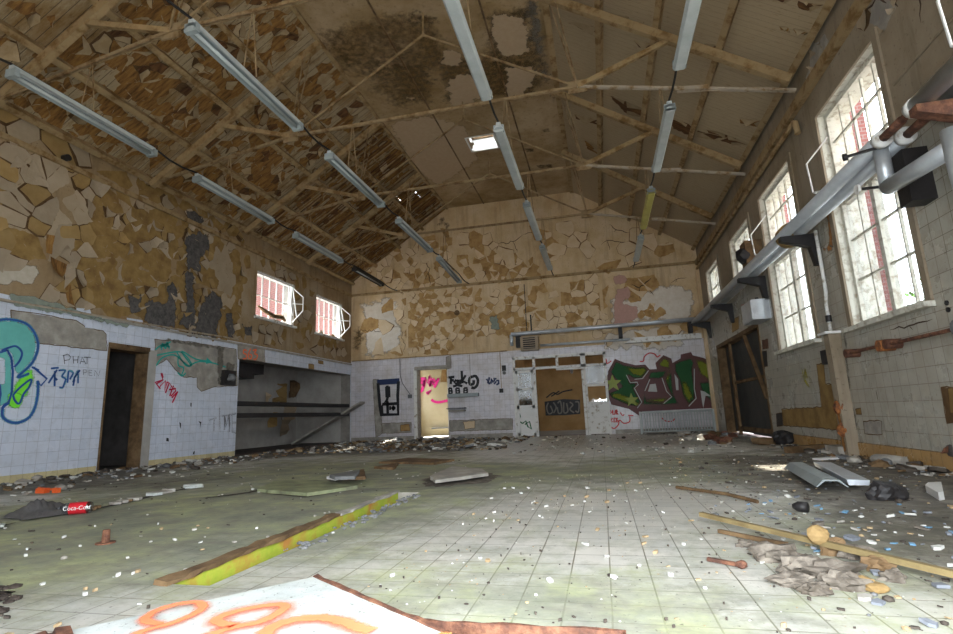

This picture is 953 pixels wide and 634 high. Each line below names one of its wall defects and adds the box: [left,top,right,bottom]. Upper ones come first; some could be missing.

peeling [772,0,823,12]
crack [865,0,921,21]
leakage [324,14,473,104]
leakage [481,1,548,95]
peeling [672,119,748,146]
peeling [0,0,698,392]
leakage [10,210,252,384]
peeling [776,363,838,431]
peeling [941,386,953,424]